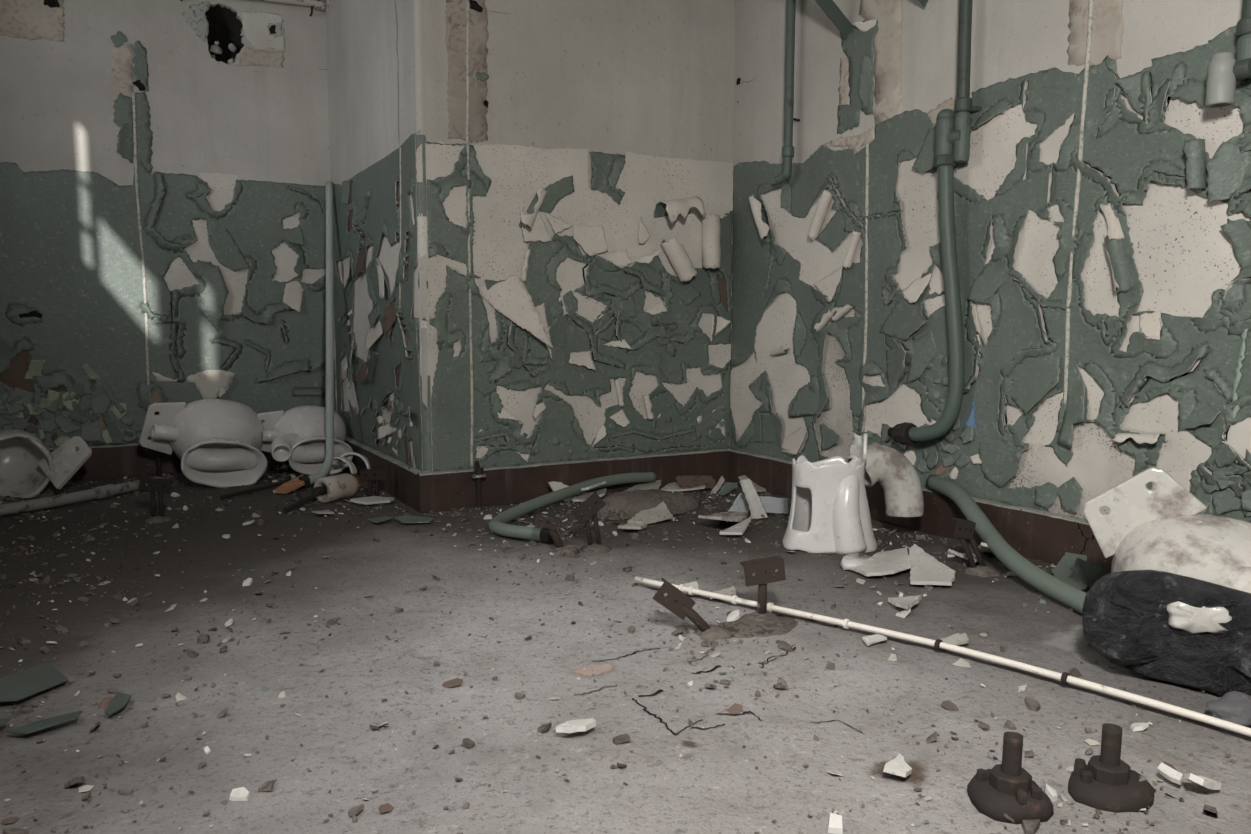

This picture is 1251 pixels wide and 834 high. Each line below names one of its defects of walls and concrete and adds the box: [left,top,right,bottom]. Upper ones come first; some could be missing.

peeling [0,0,1251,520]
crack [575,648,761,735]
crack [758,647,796,668]